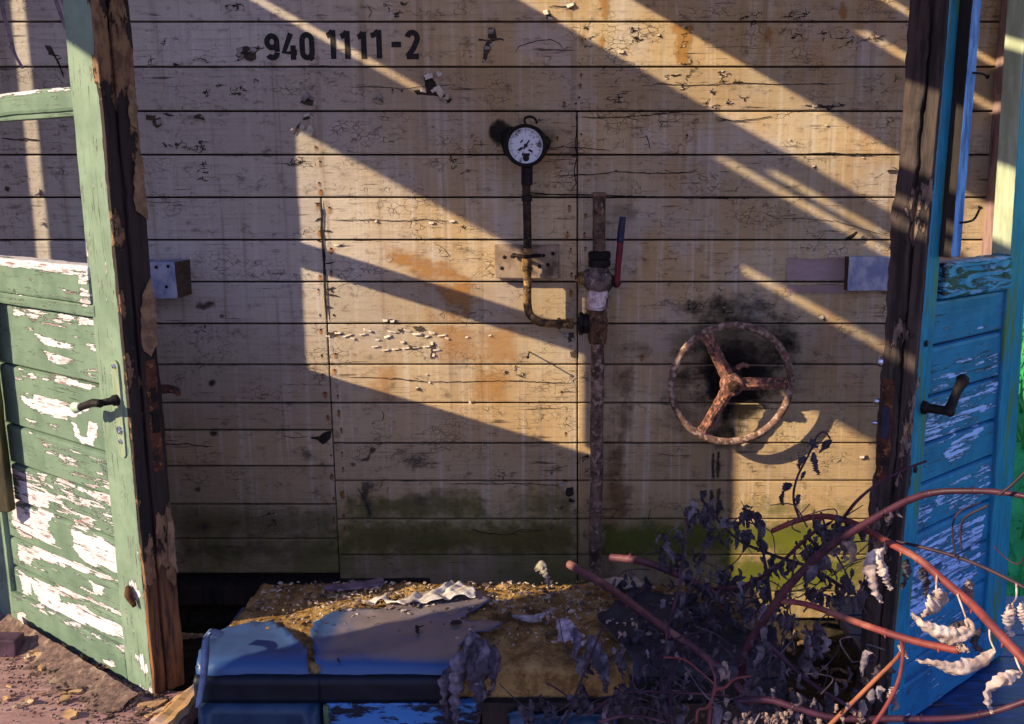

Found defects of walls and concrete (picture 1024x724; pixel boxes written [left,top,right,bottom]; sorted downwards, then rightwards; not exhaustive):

crack [630,27,644,43]
crack [739,9,887,44]
crack [363,83,456,91]
crack [517,30,898,236]
peeling [133,153,149,220]
corrosion [392,253,471,314]
leakage [709,452,721,515]